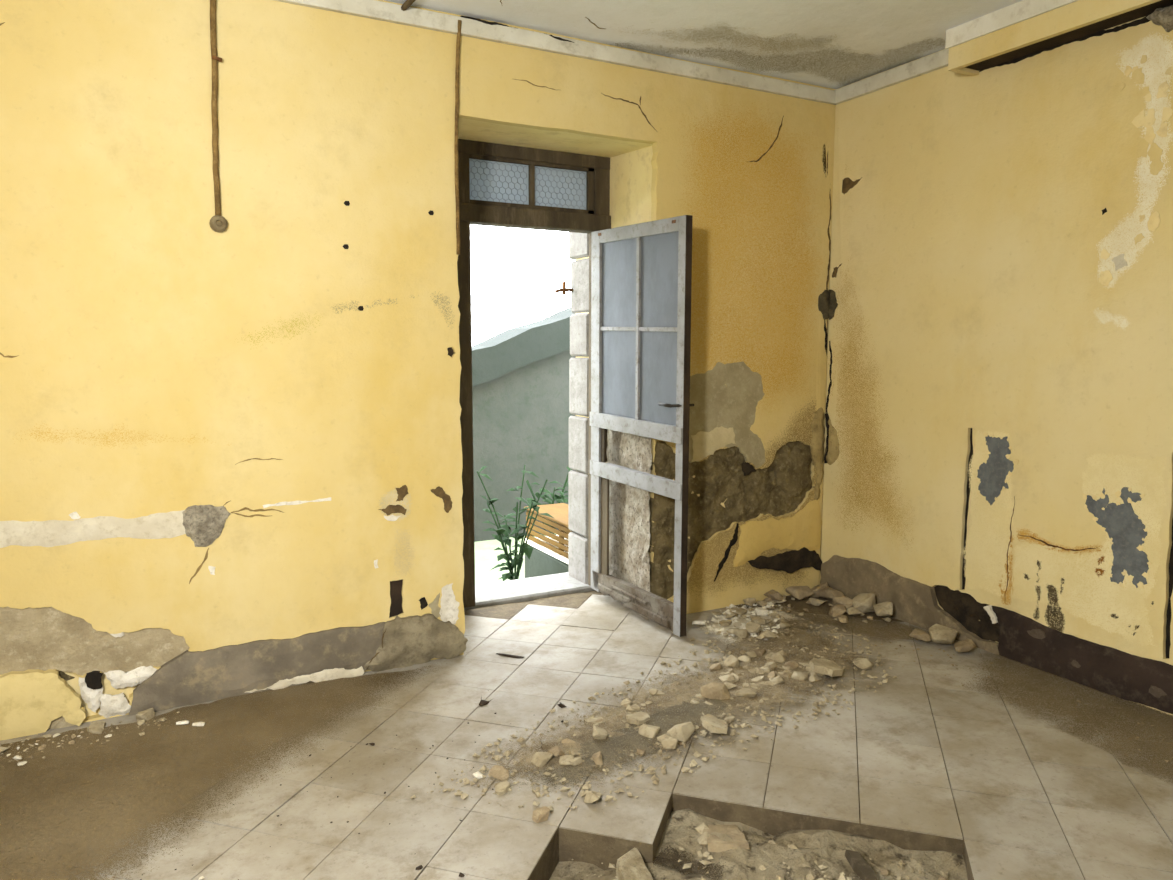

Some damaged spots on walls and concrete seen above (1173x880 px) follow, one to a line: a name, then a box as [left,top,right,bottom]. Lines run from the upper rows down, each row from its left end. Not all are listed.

crack [603,94,656,130]
crack [750,116,784,162]
peeling [1096,5,1173,291]
crack [824,153,832,290]
crack [824,319,840,465]
spalling [606,362,822,599]
peeling [976,432,1019,505]
peeling [1082,487,1152,588]
spalling [0,606,190,690]
peeling [983,605,998,624]